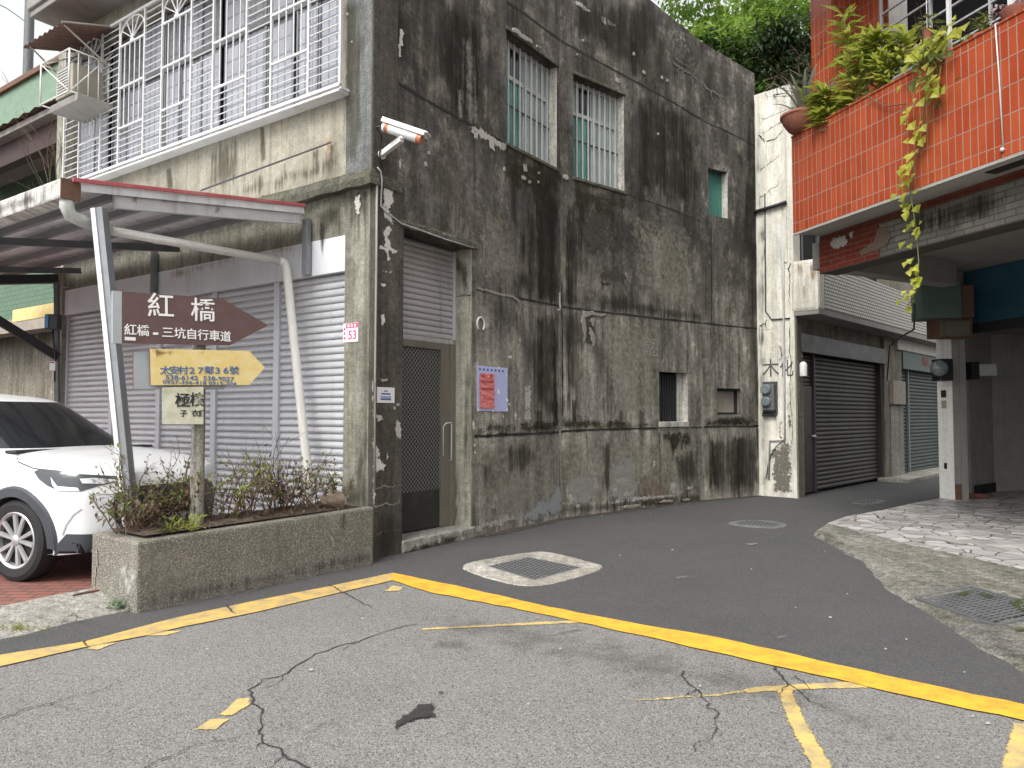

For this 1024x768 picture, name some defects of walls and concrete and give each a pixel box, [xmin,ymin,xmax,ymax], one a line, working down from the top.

water stain [579,3,655,75]
spalling [471,126,506,151]
water stain [638,97,696,200]
peeling [379,188,398,287]
water stain [745,101,764,406]
spalling [830,231,853,249]
water stain [465,184,648,470]
crack [759,233,793,466]
water stain [564,417,758,513]